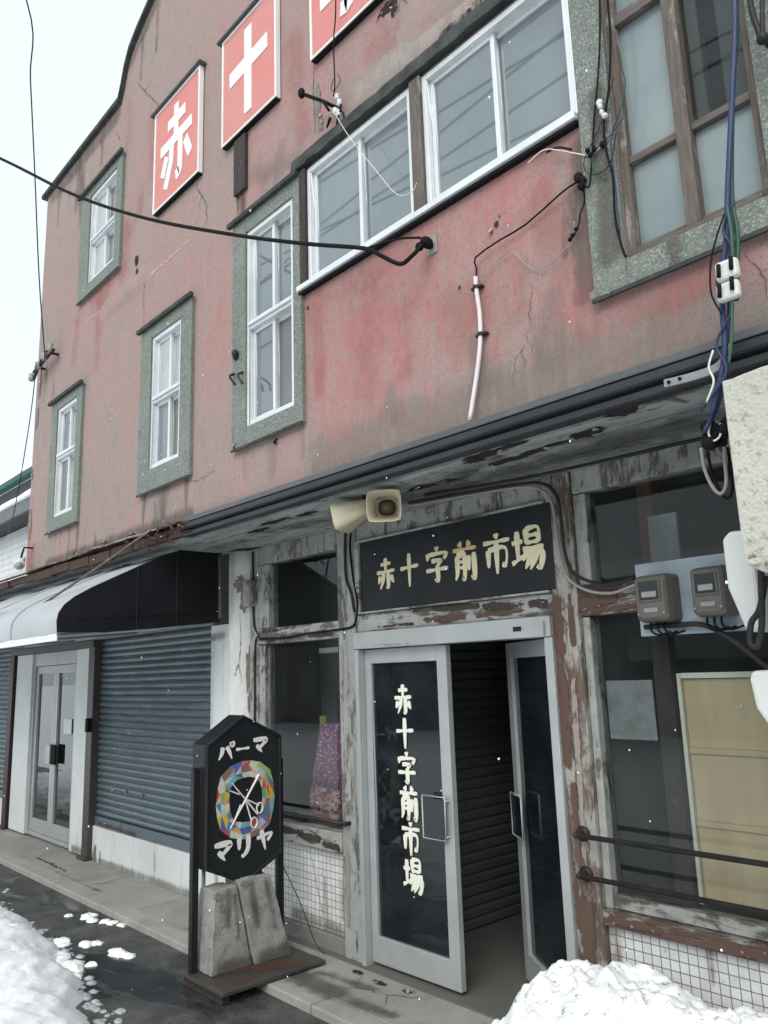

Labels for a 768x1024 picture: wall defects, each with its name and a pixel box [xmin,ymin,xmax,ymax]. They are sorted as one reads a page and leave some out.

peeling [462,404,647,469]
peeling [233,575,248,614]
peeling [377,593,768,965]